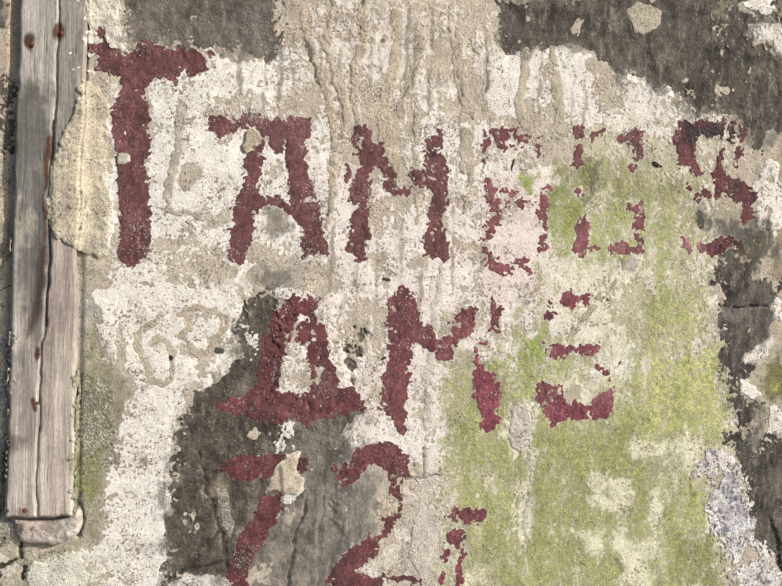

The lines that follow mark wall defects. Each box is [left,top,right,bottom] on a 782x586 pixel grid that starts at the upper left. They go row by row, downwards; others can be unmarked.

rust [24,34,34,49]
rust [53,23,65,40]
peeling [308,0,361,102]
peeling [72,64,130,227]
peeling [256,140,291,205]
peeling [368,175,391,204]
peeling [186,311,221,350]
peeling [277,337,322,396]
damp [690,446,782,586]
crack [0,537,28,581]
peeling [355,515,412,586]
peeling [460,569,490,586]